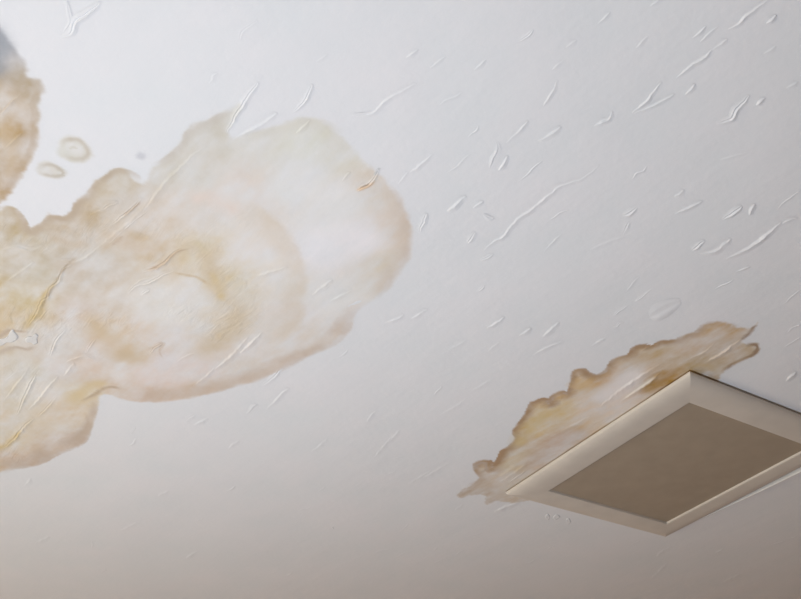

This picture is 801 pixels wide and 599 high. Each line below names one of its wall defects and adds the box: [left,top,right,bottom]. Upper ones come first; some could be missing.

water stain [0,15,416,477]
water stain [453,319,763,506]